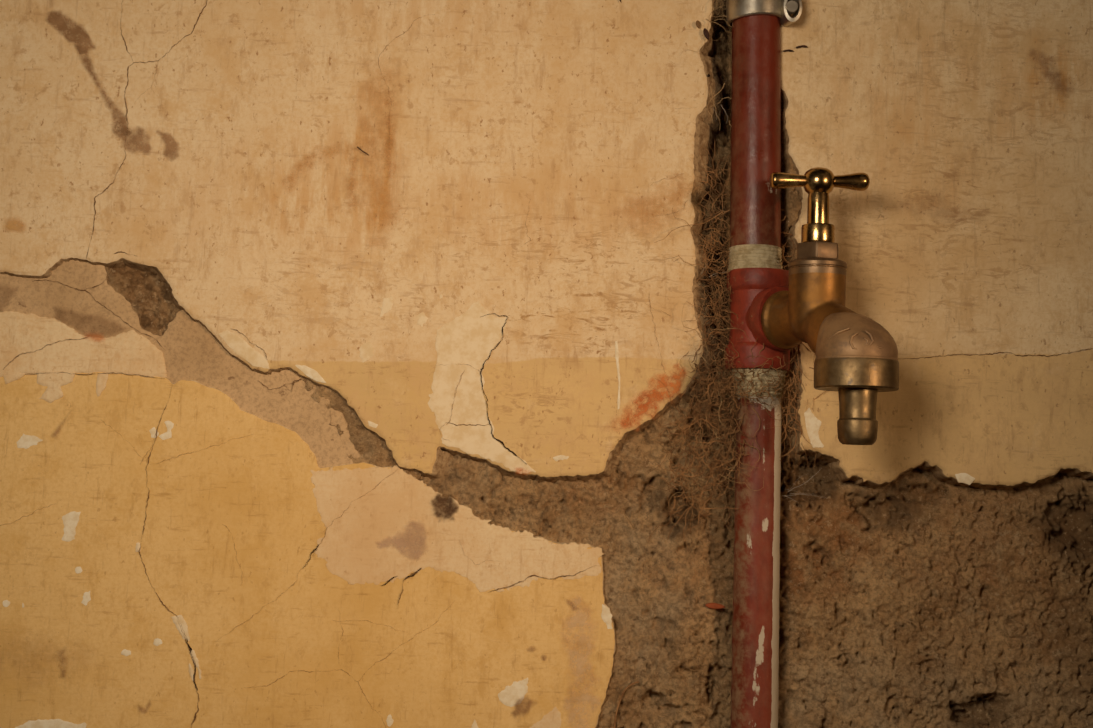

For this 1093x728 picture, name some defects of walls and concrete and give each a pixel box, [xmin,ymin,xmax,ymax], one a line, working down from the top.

damp [48,12,150,152]
crack [32,1,207,349]
damp [161,133,177,157]
crack [234,329,301,392]
crack [444,313,524,462]
rust [623,369,685,426]
crack [12,337,202,724]
spalling [0,260,737,728]
crack [381,568,422,609]
crack [492,570,585,591]
spalling [778,346,1093,728]